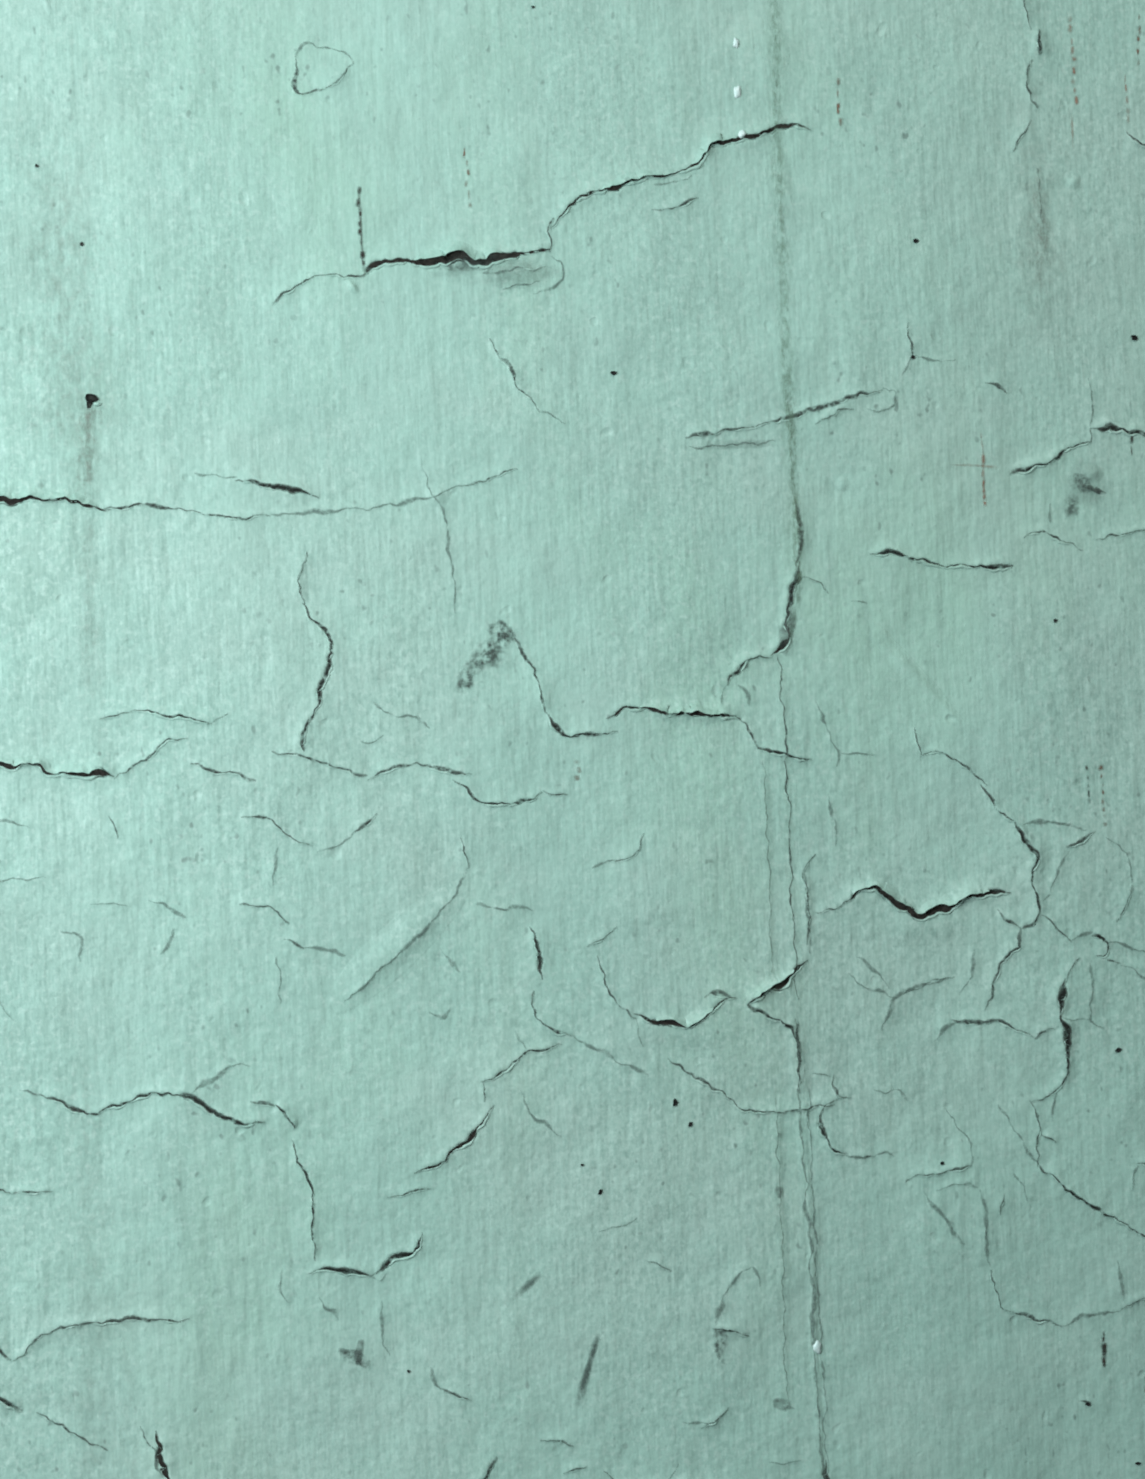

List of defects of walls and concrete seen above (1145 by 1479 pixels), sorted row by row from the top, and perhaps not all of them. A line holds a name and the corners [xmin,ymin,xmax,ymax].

crack [0,469,517,602]
crack [0,555,568,871]
crack [239,903,334,980]
crack [360,837,470,990]
crack [388,499,1145,1479]
crack [0,1188,53,1196]
crack [26,1068,423,1311]
crack [0,1316,189,1363]
crack [0,1397,108,1452]
crack [139,1426,170,1479]